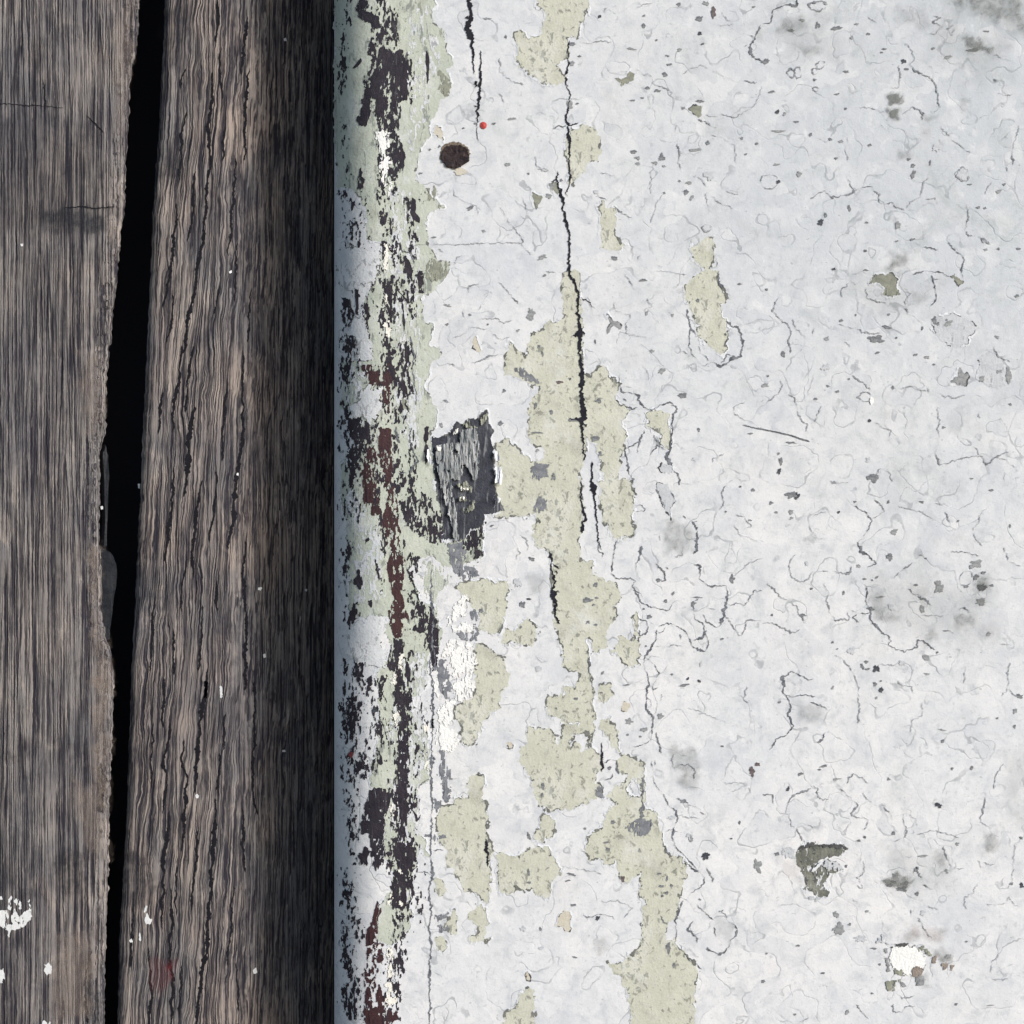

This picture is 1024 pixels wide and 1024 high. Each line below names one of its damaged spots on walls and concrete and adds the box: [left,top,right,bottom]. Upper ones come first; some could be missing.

crack [464,0,523,141]
peeling [683,224,731,359]
peeling [332,0,699,1024]
crack [401,40,1021,1024]
spalling [775,840,848,902]
peeling [895,956,955,987]